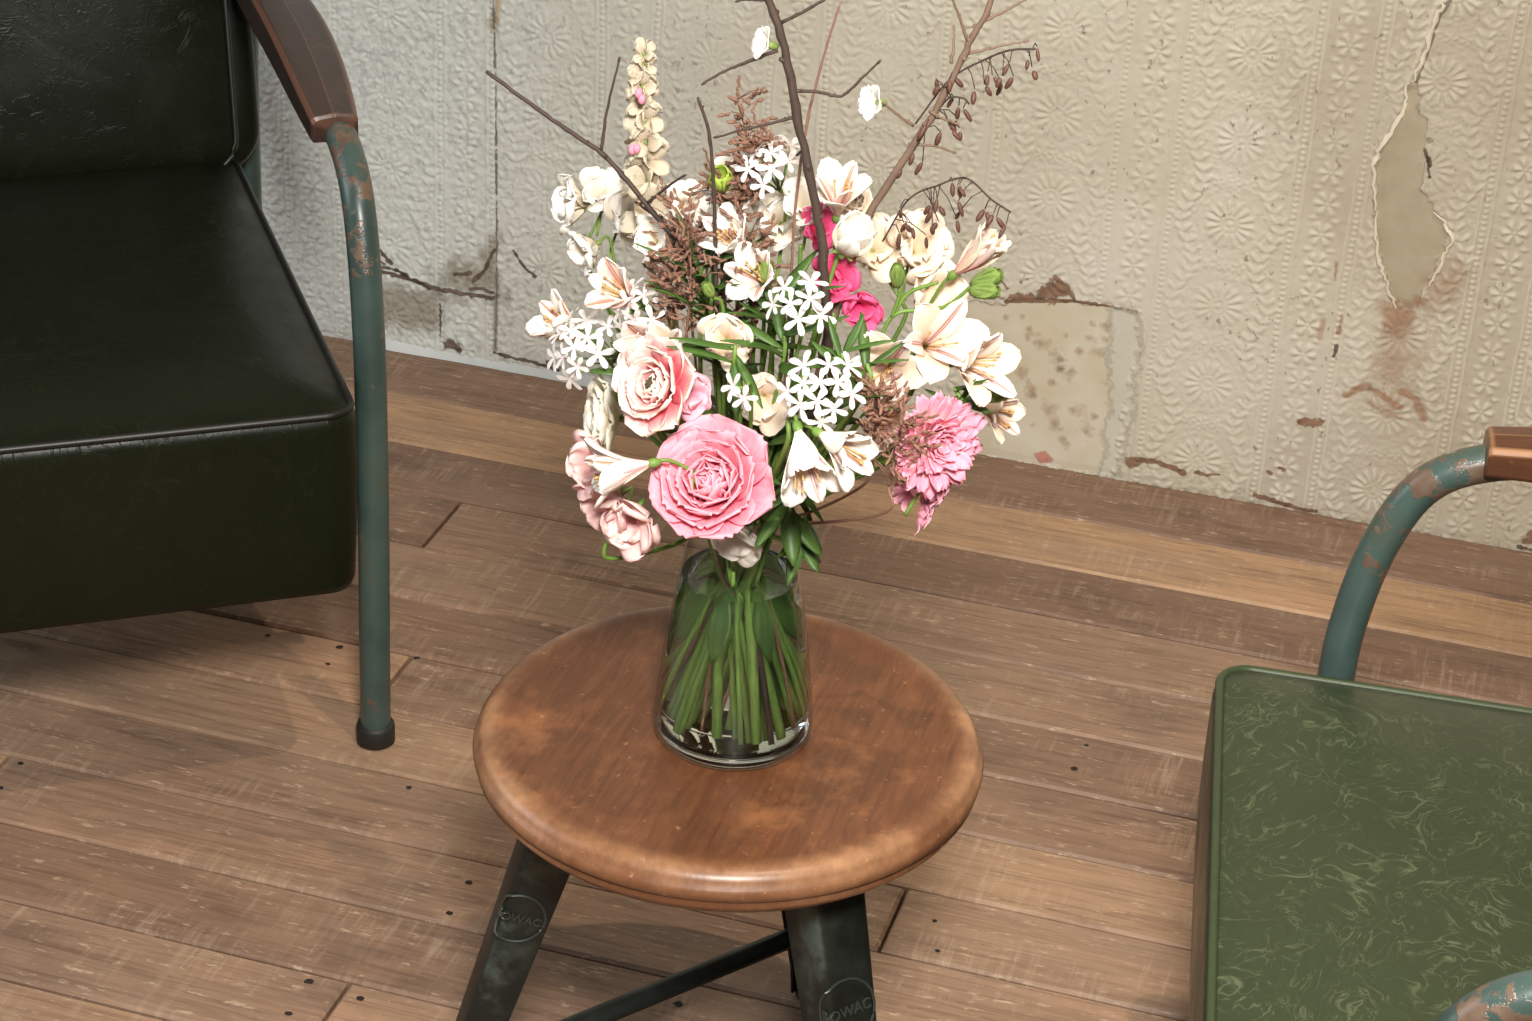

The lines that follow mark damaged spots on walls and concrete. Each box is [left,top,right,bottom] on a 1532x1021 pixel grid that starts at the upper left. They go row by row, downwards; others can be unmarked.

crack [380,0,561,372]
peeling [1370,0,1455,309]
flaking render [959,275,1220,480]